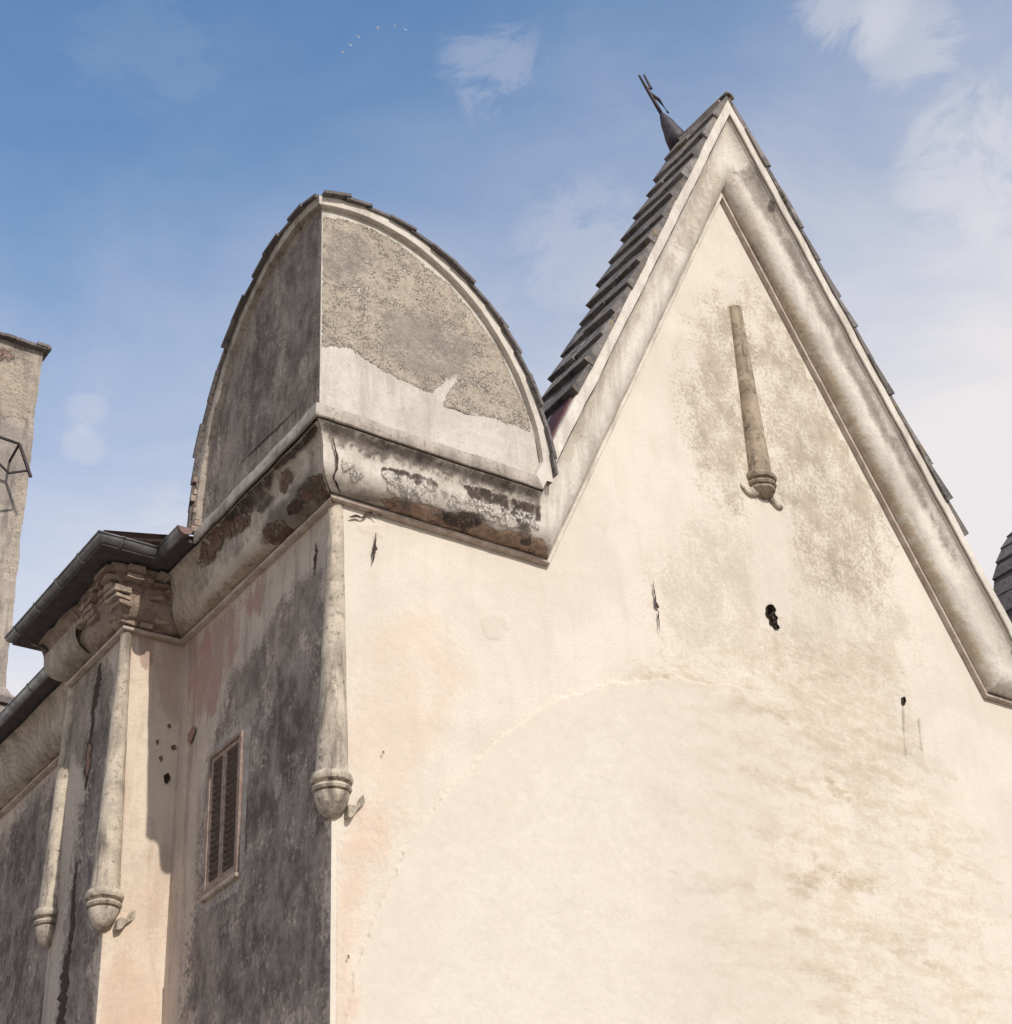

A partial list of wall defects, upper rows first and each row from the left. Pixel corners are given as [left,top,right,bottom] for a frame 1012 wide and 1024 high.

water stain [232,213,321,463]
spalling [322,217,531,432]
spalling [196,425,330,567]
water stain [214,567,323,758]
crack [332,437,340,493]
crack [349,512,382,561]
spalling [380,470,548,559]
crack [652,582,660,629]
hole [765,604,780,629]
water stain [0,839,29,1024]
crack [56,862,77,1024]
water stain [269,854,327,1024]